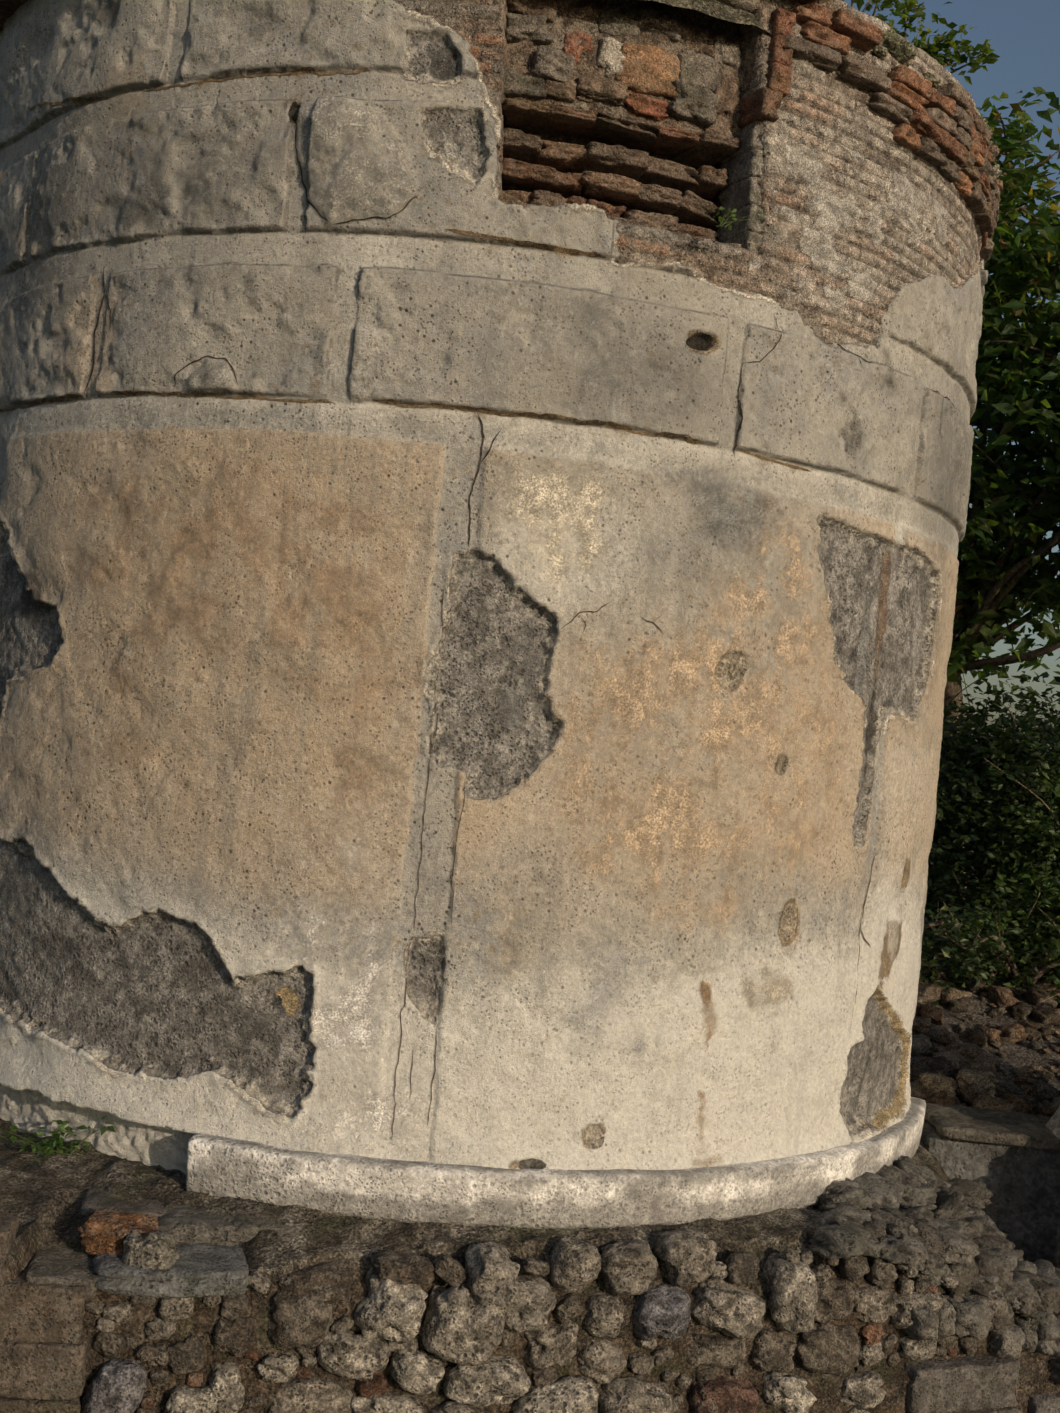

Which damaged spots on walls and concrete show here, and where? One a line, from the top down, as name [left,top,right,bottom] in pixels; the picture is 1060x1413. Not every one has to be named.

crack [295,129,420,225]
flaking render [391,0,986,349]
crack [84,268,111,394]
crack [174,355,237,388]
crack [733,315,782,457]
crack [468,413,502,544]
flaking render [0,522,64,718]
flaking render [422,550,567,800]
flaking render [817,516,942,847]
flaking render [0,833,315,1119]
flaking render [404,932,447,1025]
flaking render [839,985,912,1141]